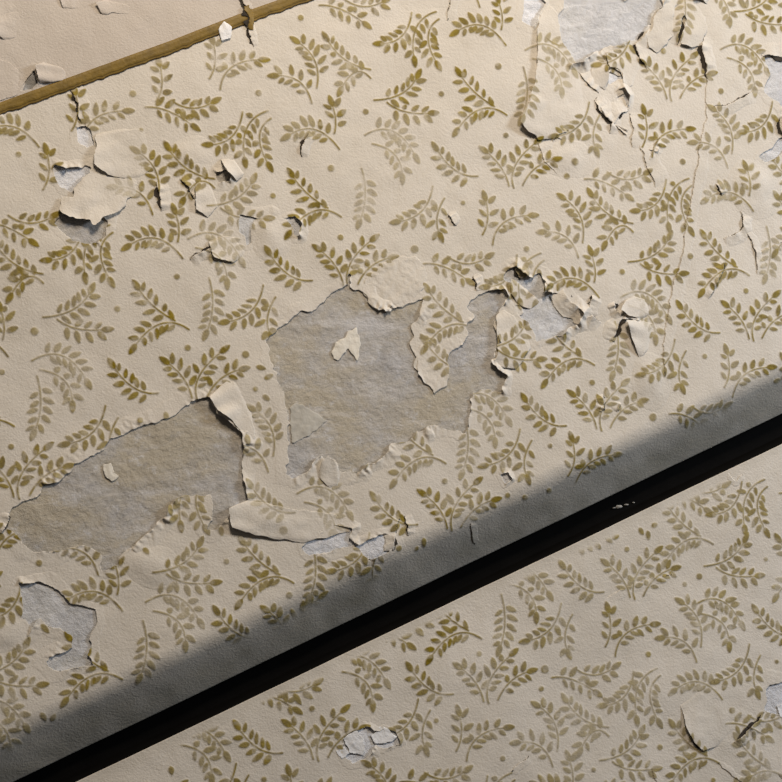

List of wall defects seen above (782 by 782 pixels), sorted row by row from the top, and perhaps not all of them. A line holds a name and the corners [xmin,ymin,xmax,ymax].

peeling [0,60,65,100]
peeling [514,0,708,140]
crack [579,0,686,188]
peeling [755,46,782,118]
peeling [44,118,152,252]
peeling [195,159,244,217]
crack [663,36,782,383]
peeling [256,256,593,489]
peeling [621,296,652,357]
peeling [0,382,405,683]
peeling [331,721,407,770]
peeling [680,669,782,779]